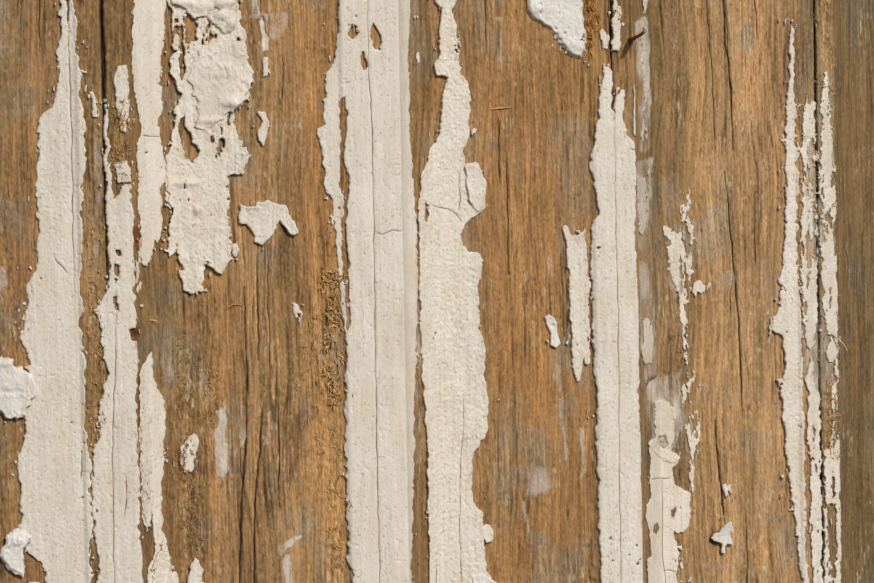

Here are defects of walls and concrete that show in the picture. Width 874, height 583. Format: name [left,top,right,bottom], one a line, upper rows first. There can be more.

peeling [527,0,590,67]
peeling [599,0,624,51]
crack [706,0,733,150]
peeling [0,0,298,583]
crack [239,257,280,583]
peeling [316,0,499,583]
peeling [544,36,711,583]
crack [715,425,724,515]
crack [742,517,750,583]
peeling [768,18,842,583]